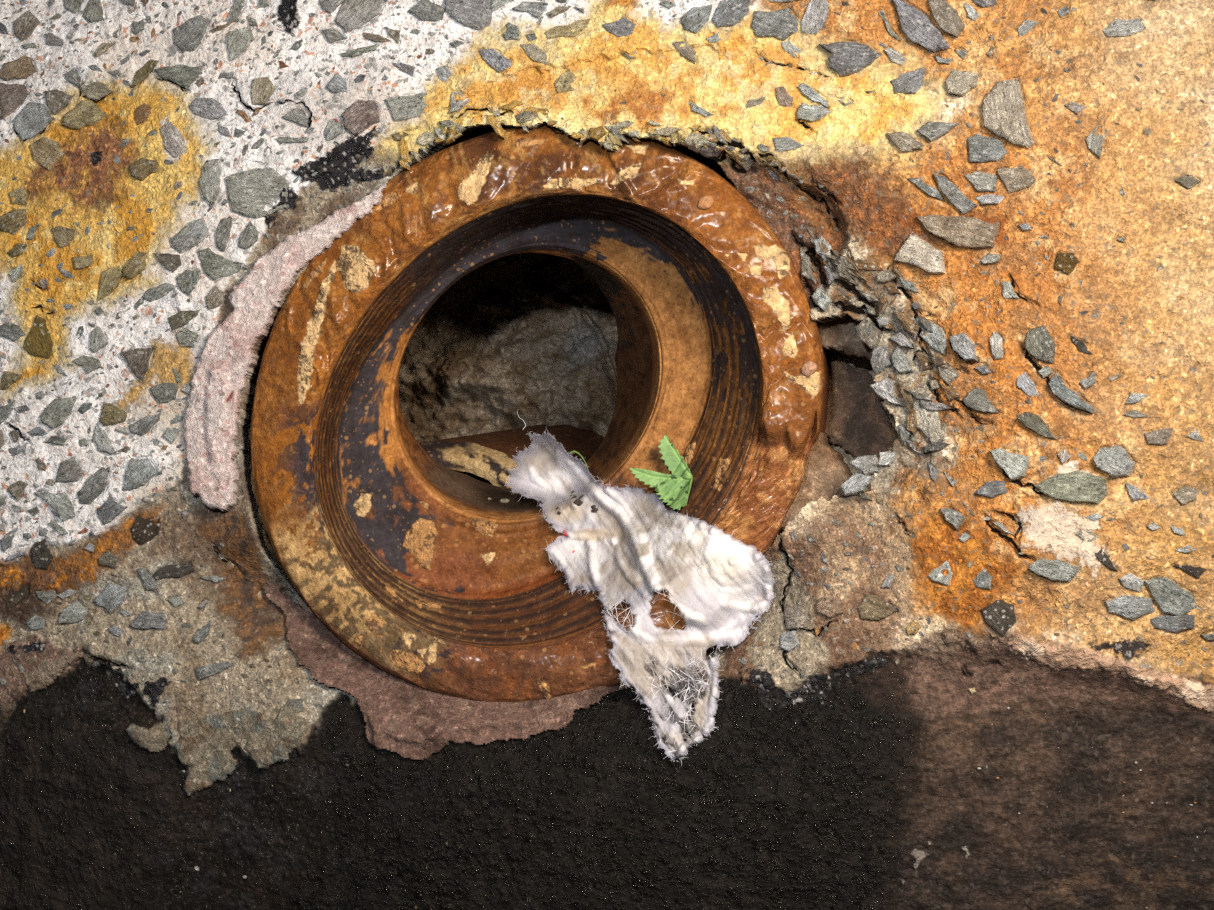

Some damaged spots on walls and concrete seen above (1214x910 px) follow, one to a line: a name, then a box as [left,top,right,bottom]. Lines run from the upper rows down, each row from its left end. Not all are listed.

rust [0,79,208,409]
rust [379,0,1214,681]
spalling [724,236,933,399]
spalling [898,352,960,455]
rust [0,512,158,651]
rust [201,510,293,658]
damp [1008,634,1214,712]
damp [0,708,177,910]
damp [289,656,917,910]